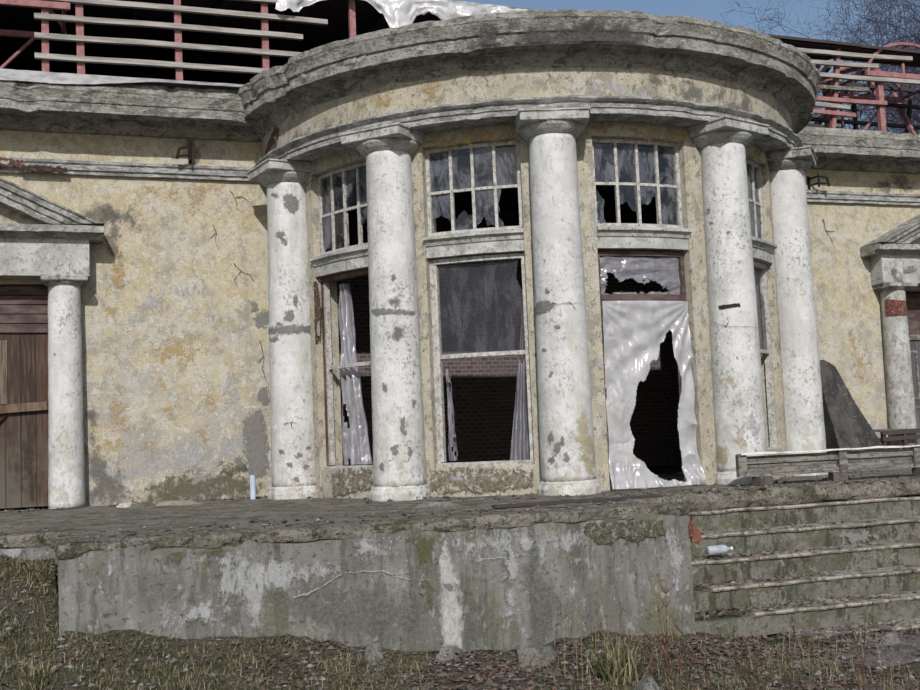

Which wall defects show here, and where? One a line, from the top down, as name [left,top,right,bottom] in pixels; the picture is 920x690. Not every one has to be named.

flaking render [265,127,279,155]
flaking render [0,157,52,172]
flaking render [250,295,298,342]
flaking render [885,299,907,316]
damp [84,410,264,504]
crack [293,563,429,598]
damp [426,529,581,649]